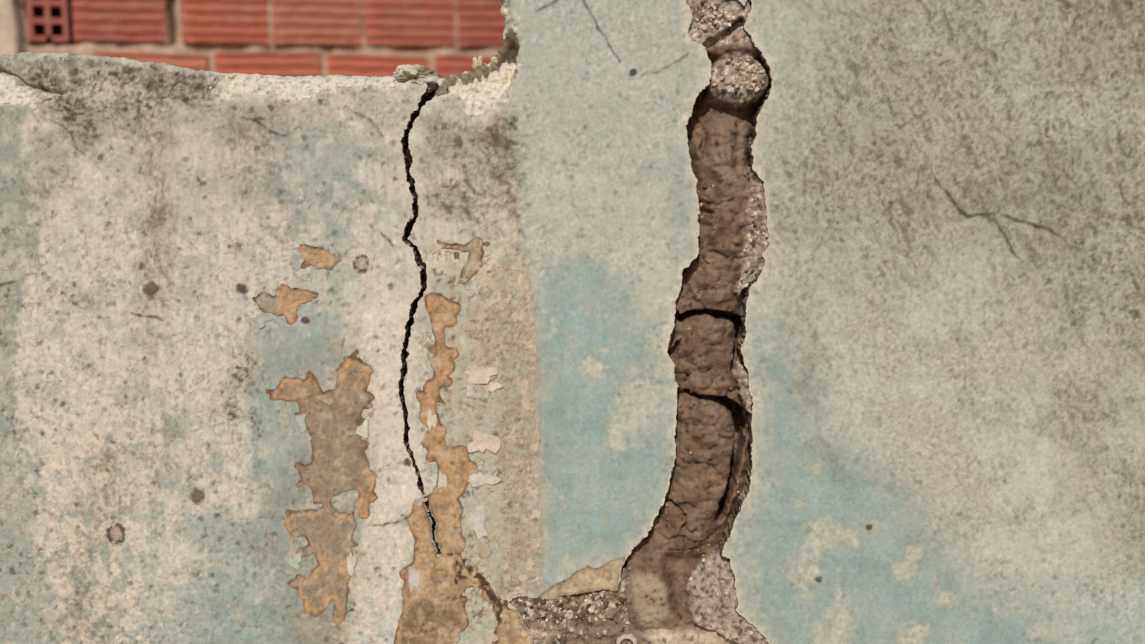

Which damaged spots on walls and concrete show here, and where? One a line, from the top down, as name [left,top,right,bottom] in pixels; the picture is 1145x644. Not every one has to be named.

spalling [430,0,521,117]
peeling [236,283,319,328]
peeling [265,349,378,626]
peeling [289,244,368,272]
crack [388,86,503,623]
peeling [430,237,490,284]
peeling [394,252,645,644]
crack [622,0,770,644]